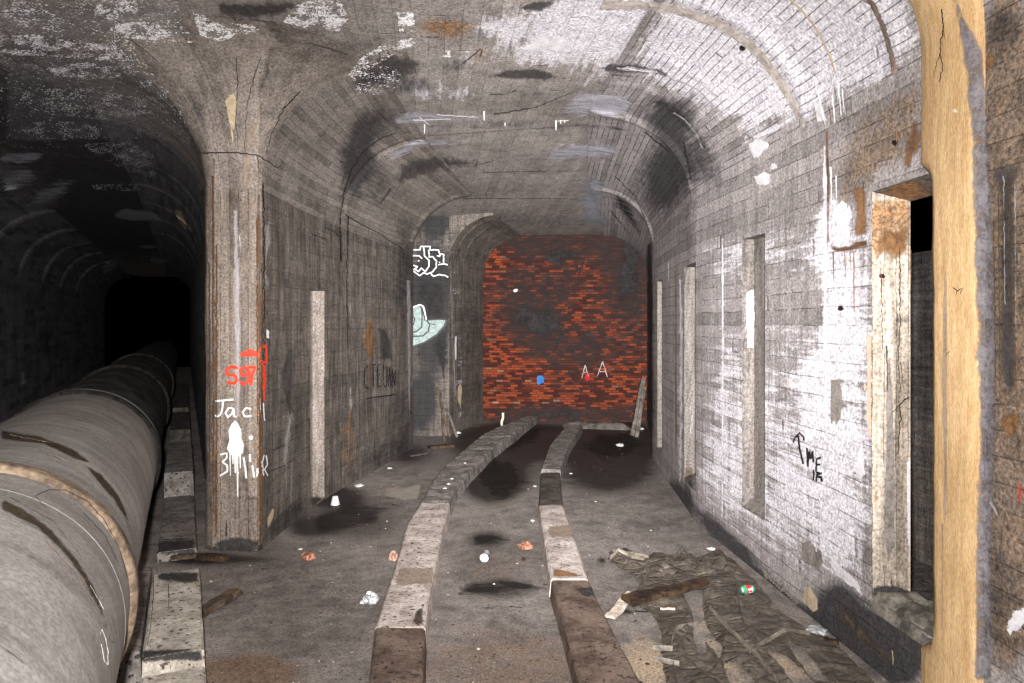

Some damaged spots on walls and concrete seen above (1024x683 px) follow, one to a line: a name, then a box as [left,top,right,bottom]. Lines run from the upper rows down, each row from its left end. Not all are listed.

water stain [355,53,418,88]
crack [934,9,945,82]
crack [152,57,300,385]
crack [312,133,404,349]
rust [826,132,867,309]
rust [880,231,911,280]
rust [208,176,218,534]